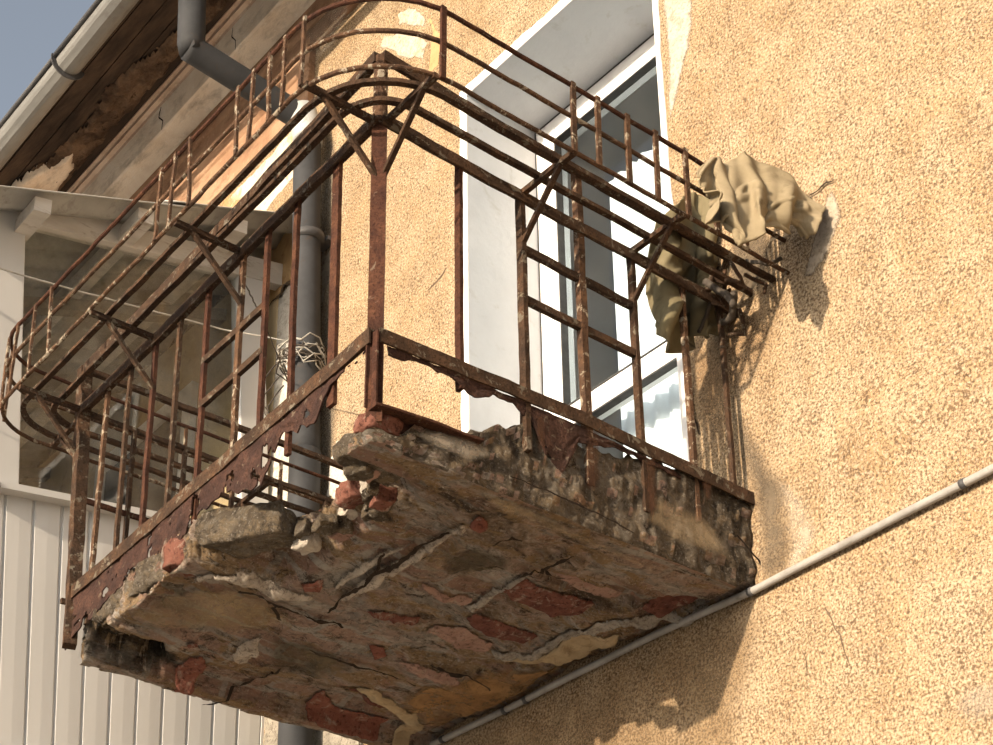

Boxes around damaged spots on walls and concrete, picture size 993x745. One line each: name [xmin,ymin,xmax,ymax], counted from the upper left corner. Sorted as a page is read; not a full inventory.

peeling [380,8,440,71]
flaking render [22,31,179,191]
peeling [262,233,292,410]
spalling [92,413,488,626]
water stain [742,434,784,569]
crack [238,532,451,628]
crack [519,557,572,579]
spalling [421,573,707,666]
flaking render [263,717,278,745]
crack [310,650,416,686]
spalling [305,688,424,745]
crack [430,665,491,691]